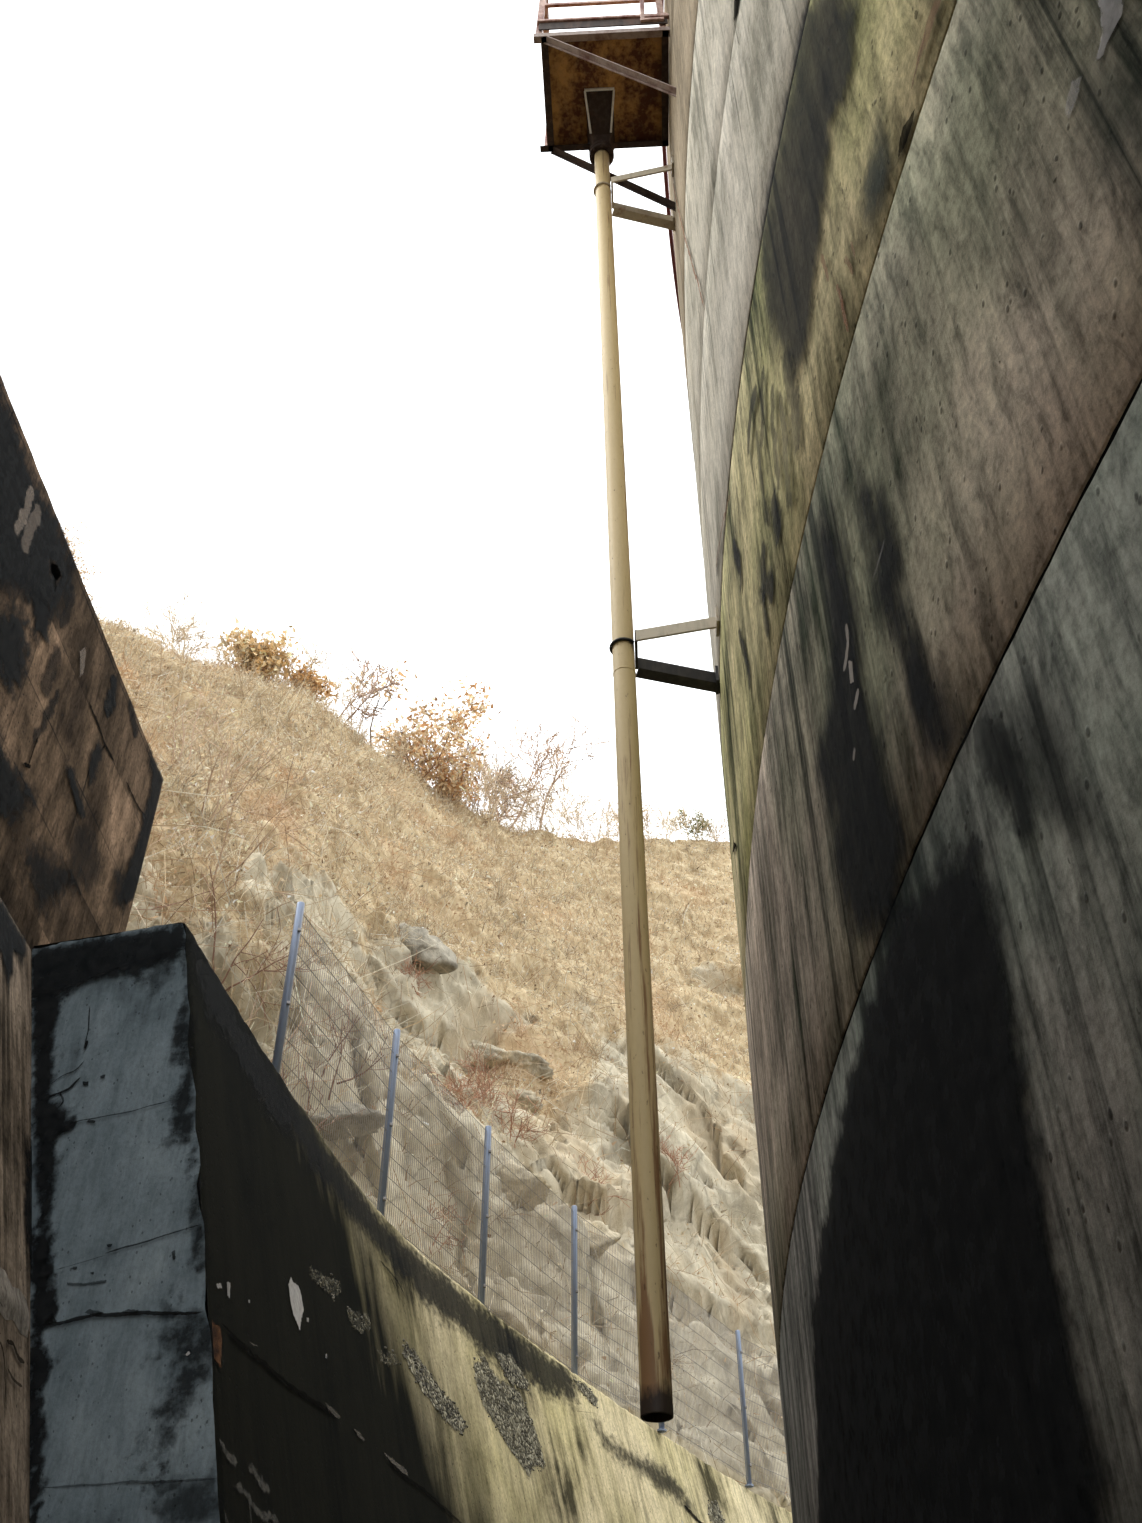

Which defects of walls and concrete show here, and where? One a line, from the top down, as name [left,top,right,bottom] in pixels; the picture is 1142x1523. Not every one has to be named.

water stain [0,377,75,699]
water stain [33,691,59,744]
water stain [0,736,35,824]
water stain [66,742,102,817]
water stain [104,675,164,905]
peeling [288,1278,304,1329]